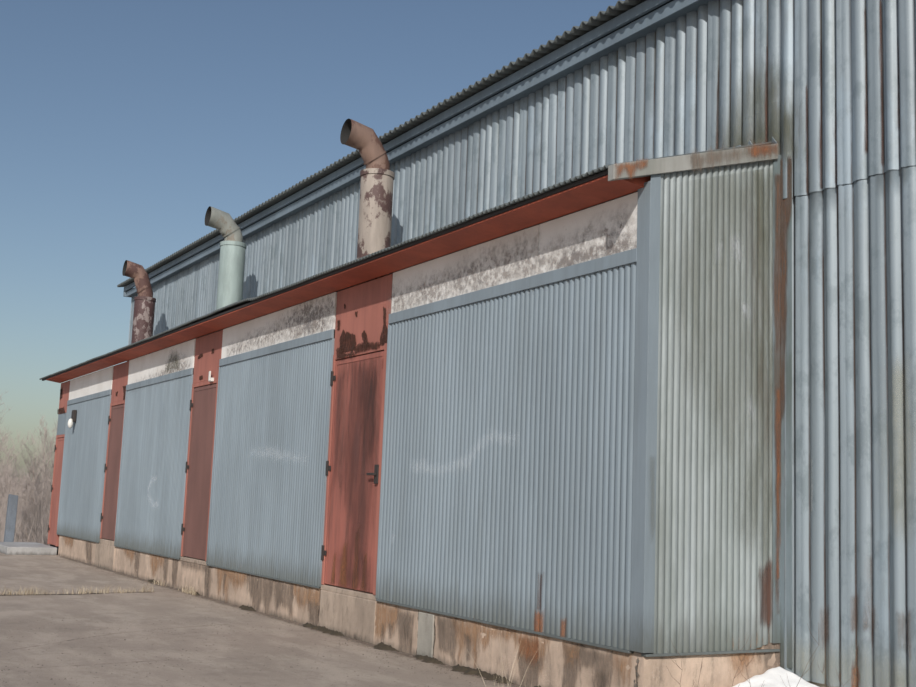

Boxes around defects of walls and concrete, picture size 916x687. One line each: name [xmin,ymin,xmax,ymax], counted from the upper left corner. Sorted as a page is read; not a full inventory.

corrosion [618,161,646,177]
leakage [393,224,631,309]
leakage [231,304,334,351]
corrosion [761,157,792,626]
leakage [59,541,181,591]
leakage [182,561,240,607]
leakage [249,575,302,626]
leakage [389,612,423,660]
leakage [564,646,612,687]